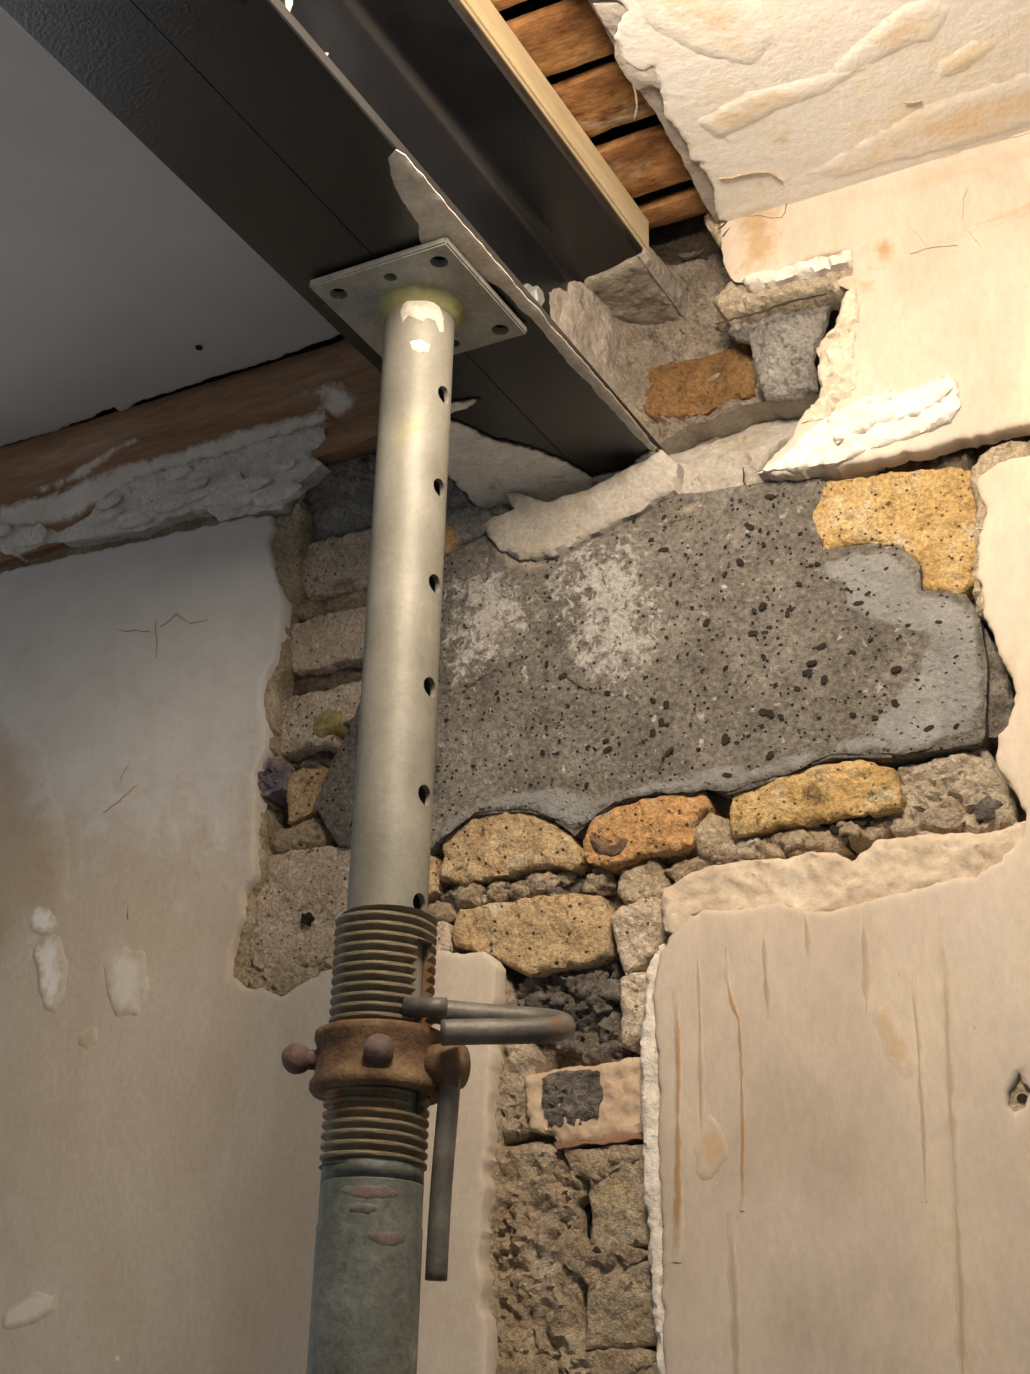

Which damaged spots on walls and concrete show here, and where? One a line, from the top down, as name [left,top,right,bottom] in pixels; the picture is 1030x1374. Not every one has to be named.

damp [0,715,71,1003]
spalling [0,426,377,997]
spalling [428,0,1030,1374]